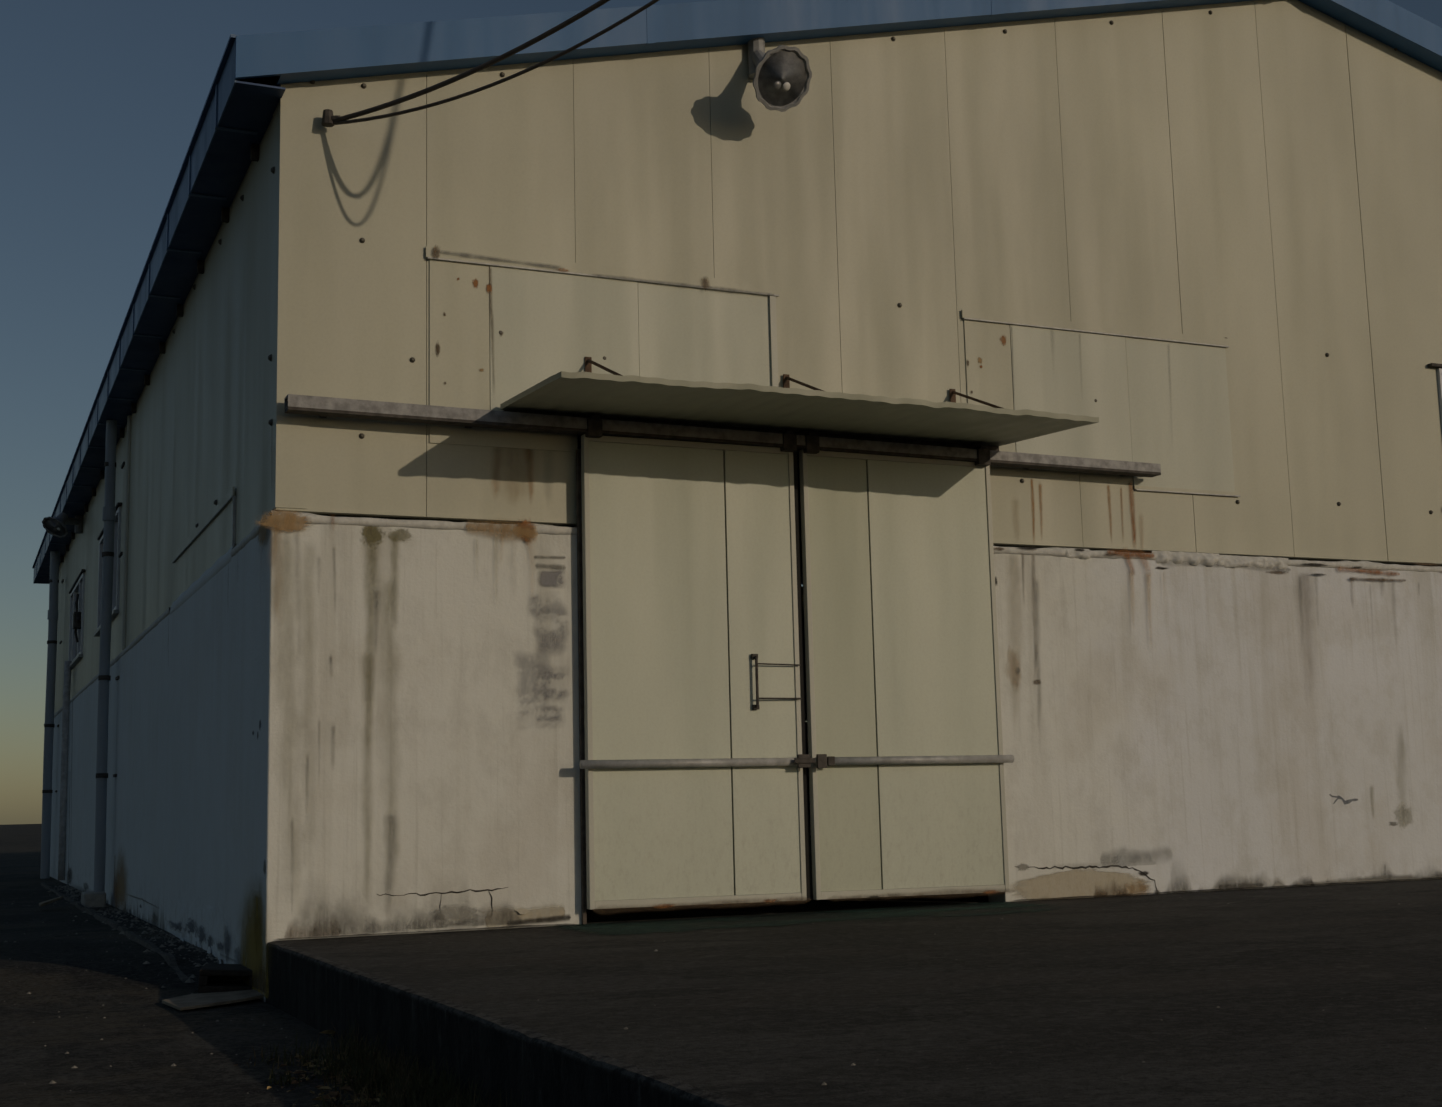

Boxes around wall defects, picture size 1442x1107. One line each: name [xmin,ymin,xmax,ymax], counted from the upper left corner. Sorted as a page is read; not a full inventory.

rust [258,509,308,543]
damp [362,526,407,572]
rust [466,520,538,542]
rust [1108,483,1155,581]
flaking render [1015,864,1442,901]